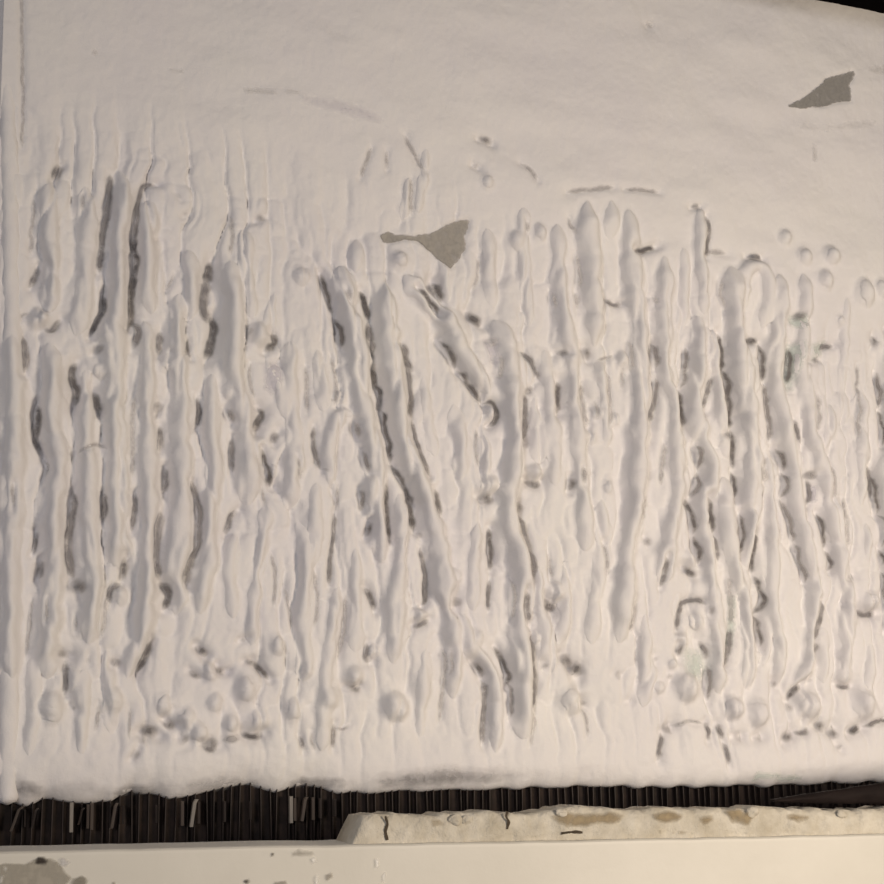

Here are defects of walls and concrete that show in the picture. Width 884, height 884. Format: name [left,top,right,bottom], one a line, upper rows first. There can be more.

peeling [789,71,854,108]
peeling [381,220,468,268]
peeling [0,859,85,884]